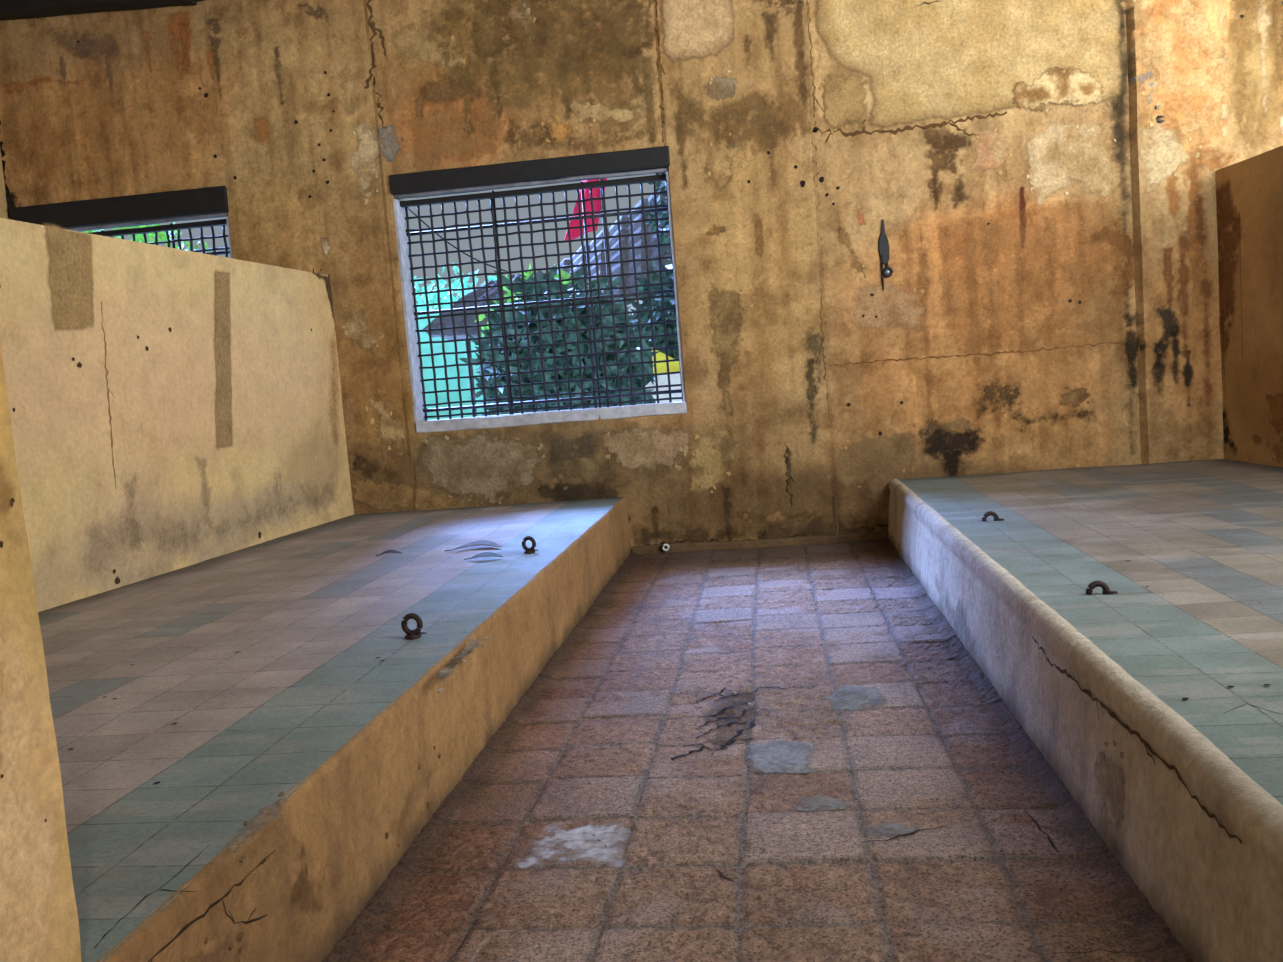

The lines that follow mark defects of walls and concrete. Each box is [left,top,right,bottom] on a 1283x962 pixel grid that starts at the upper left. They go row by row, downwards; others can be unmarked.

crack [364,0,387,128]
leakage [415,0,656,151]
leakage [1112,0,1135,172]
peeling [350,123,404,204]
crack [806,0,1121,429]
leakage [1092,193,1193,406]
leakage [806,335,823,443]
leakage [919,423,983,476]
crack [1032,636,1242,844]
crack [1024,809,1059,852]
crack [94,845,275,962]